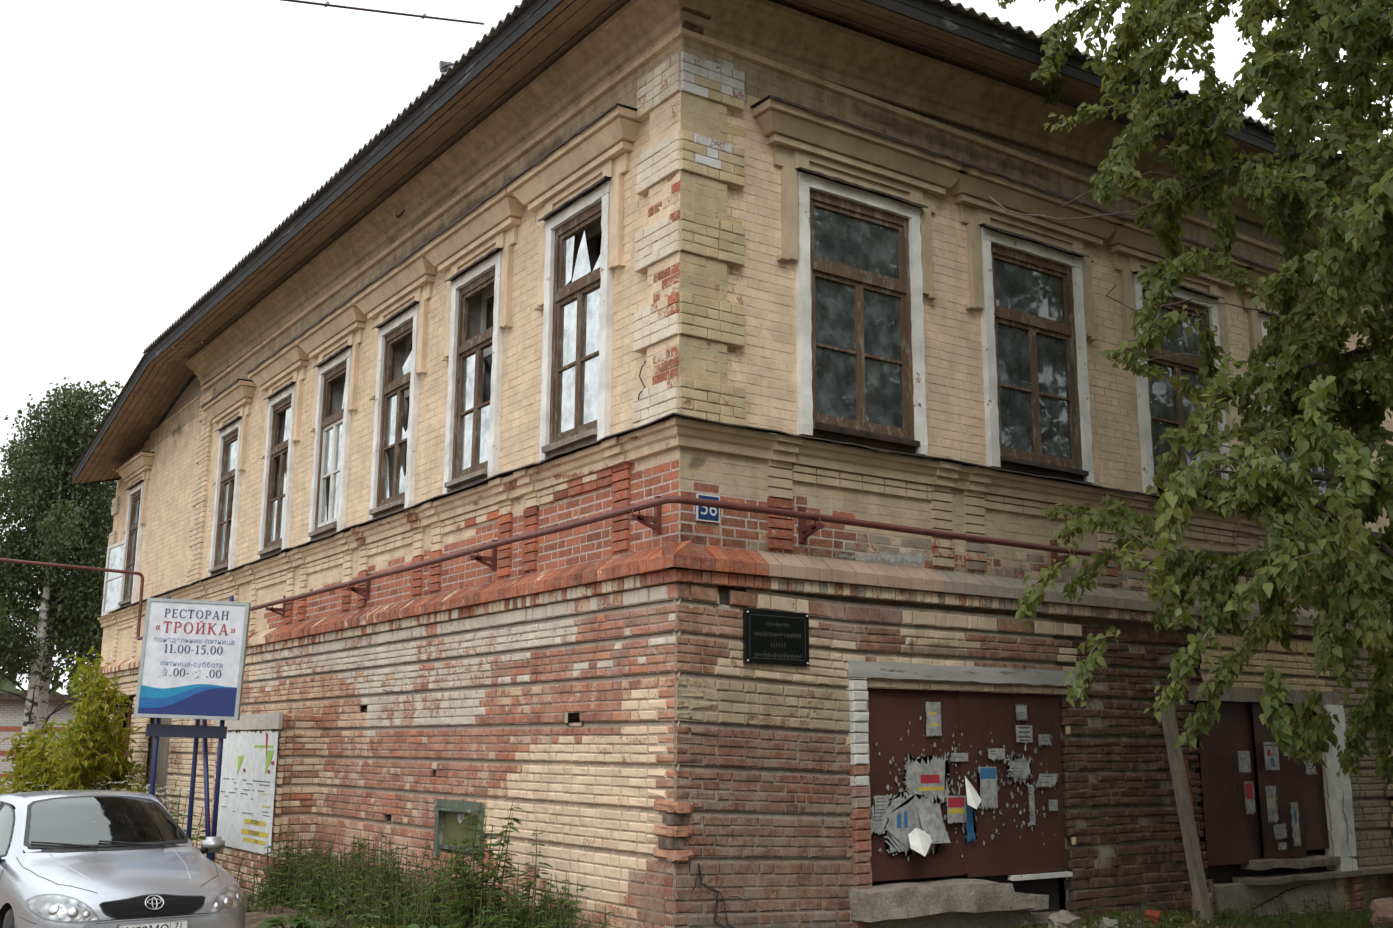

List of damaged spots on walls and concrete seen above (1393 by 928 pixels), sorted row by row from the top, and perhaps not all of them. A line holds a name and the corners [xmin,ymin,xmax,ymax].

peeling [678,51,746,102]
peeling [693,133,733,171]
peeling [648,180,684,224]
peeling [650,262,683,321]
peeling [653,345,679,390]
peeling [264,459,856,629]
peeling [323,583,757,861]